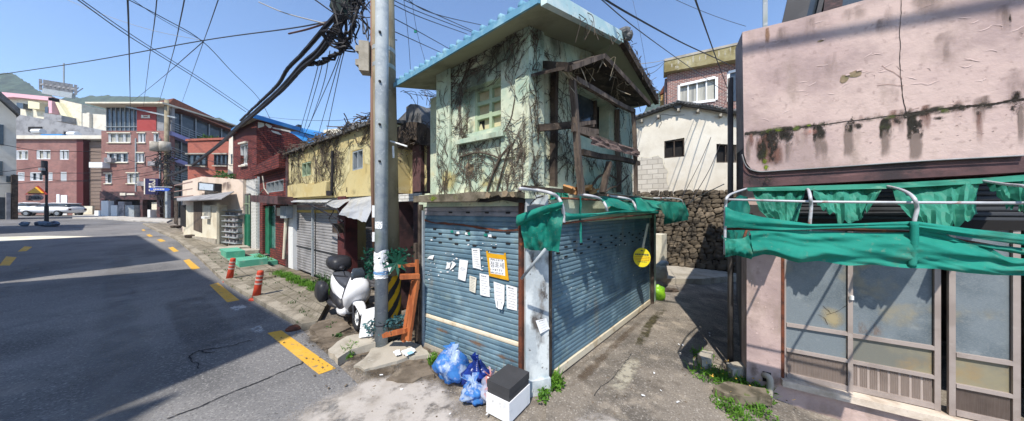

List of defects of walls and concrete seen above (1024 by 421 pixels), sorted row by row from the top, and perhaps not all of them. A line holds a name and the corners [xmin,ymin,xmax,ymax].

crack [745,1,1024,135]
leakage [747,127,794,182]
leakage [807,124,827,152]
leakage [844,117,862,153]
leakage [880,105,942,157]
leakage [1011,92,1024,137]